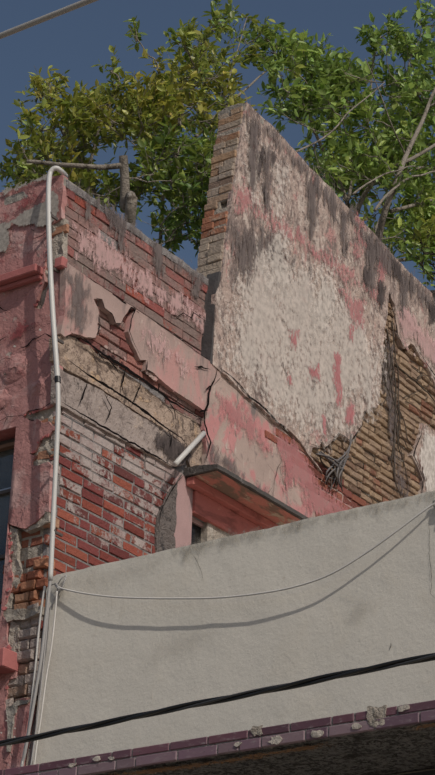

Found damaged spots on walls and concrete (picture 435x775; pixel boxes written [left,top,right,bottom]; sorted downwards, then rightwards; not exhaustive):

peeling [0,190,206,332]
water stain [229,95,435,324]
spalling [24,405,61,470]
spalling [78,300,204,426]
crack [0,278,374,540]
peeling [217,163,435,517]
spalling [0,511,60,752]
spalling [250,725,282,745]
spalling [352,705,387,729]